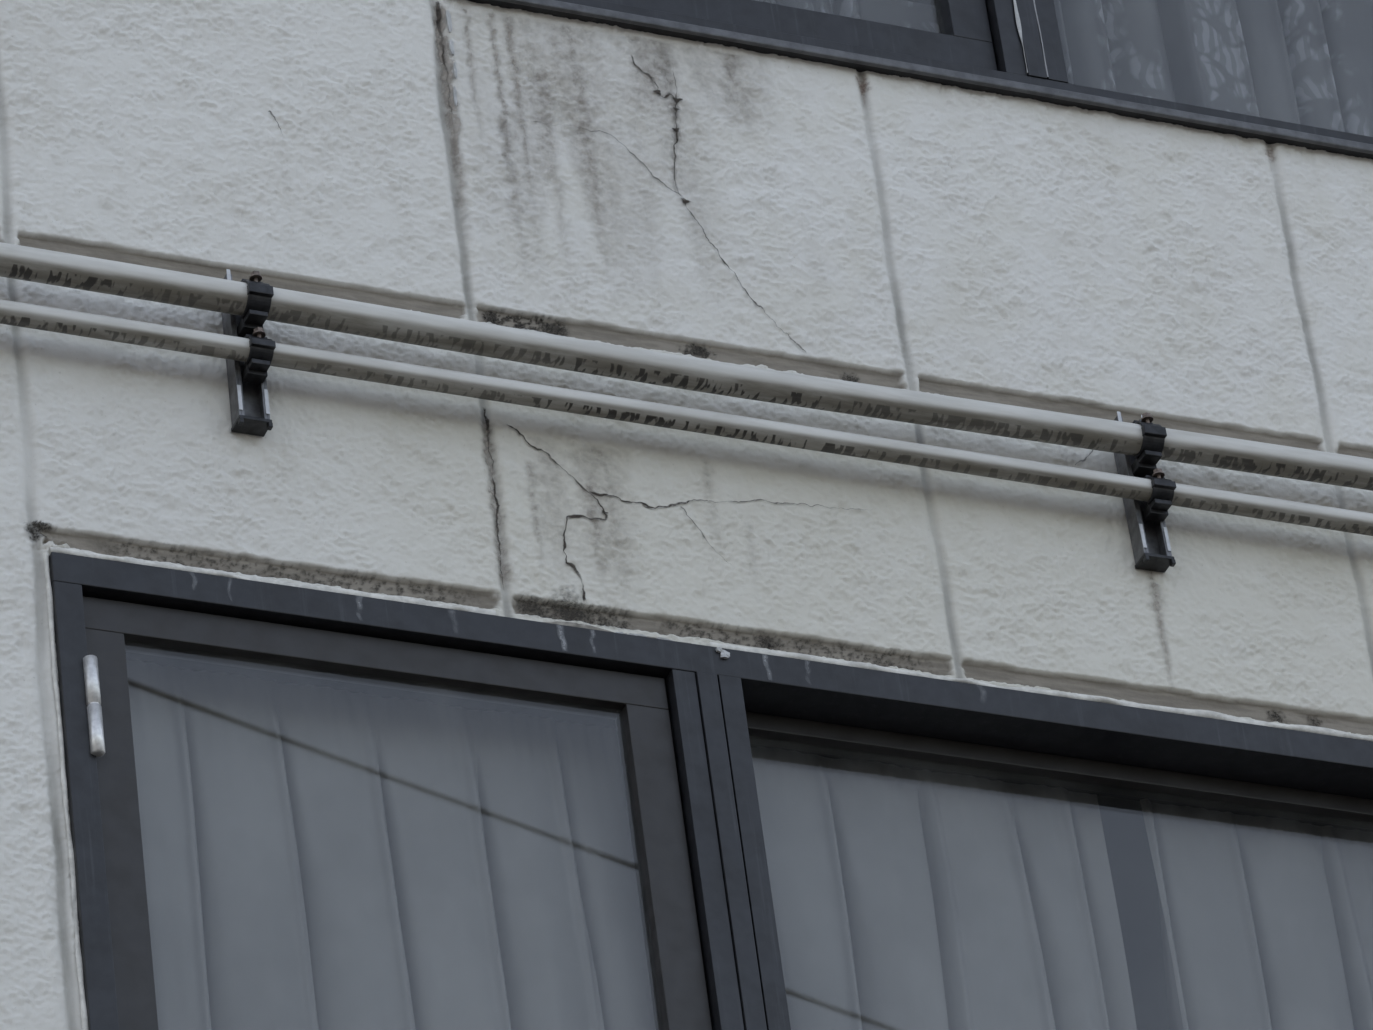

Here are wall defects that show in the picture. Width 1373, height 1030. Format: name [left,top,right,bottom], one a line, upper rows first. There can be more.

damp [434,7,463,188]
crack [590,56,763,309]
crack [483,409,853,600]